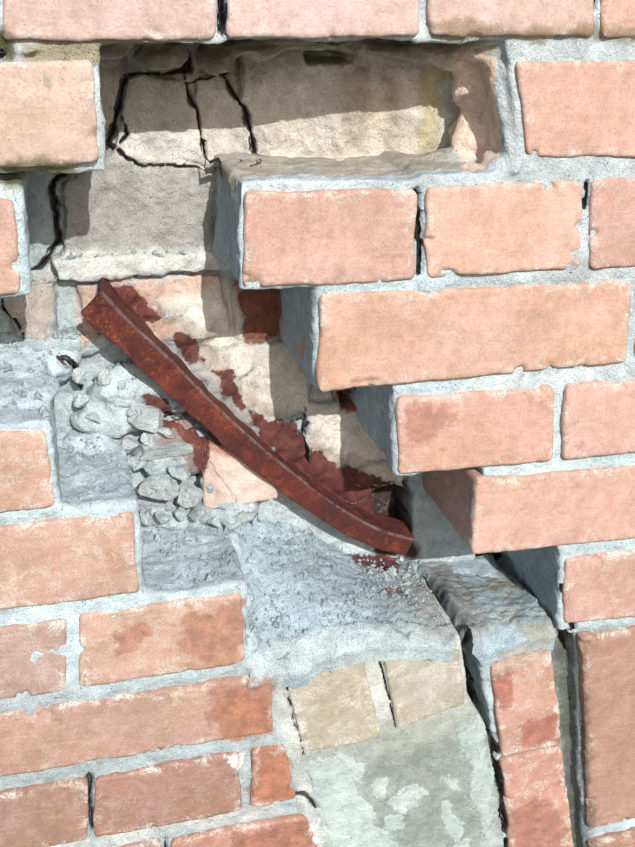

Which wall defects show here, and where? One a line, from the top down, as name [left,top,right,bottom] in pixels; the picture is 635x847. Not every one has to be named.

crack [217,0,226,33]
crack [105,56,262,191]
crack [413,188,422,275]
rust [113,285,161,323]
rust [173,332,206,365]
spalling [237,288,283,344]
rust [141,394,210,473]
spalling [198,431,278,508]
rust [211,369,401,525]
spalling [114,625,150,655]
spalling [179,599,245,668]
crack [450,620,509,847]